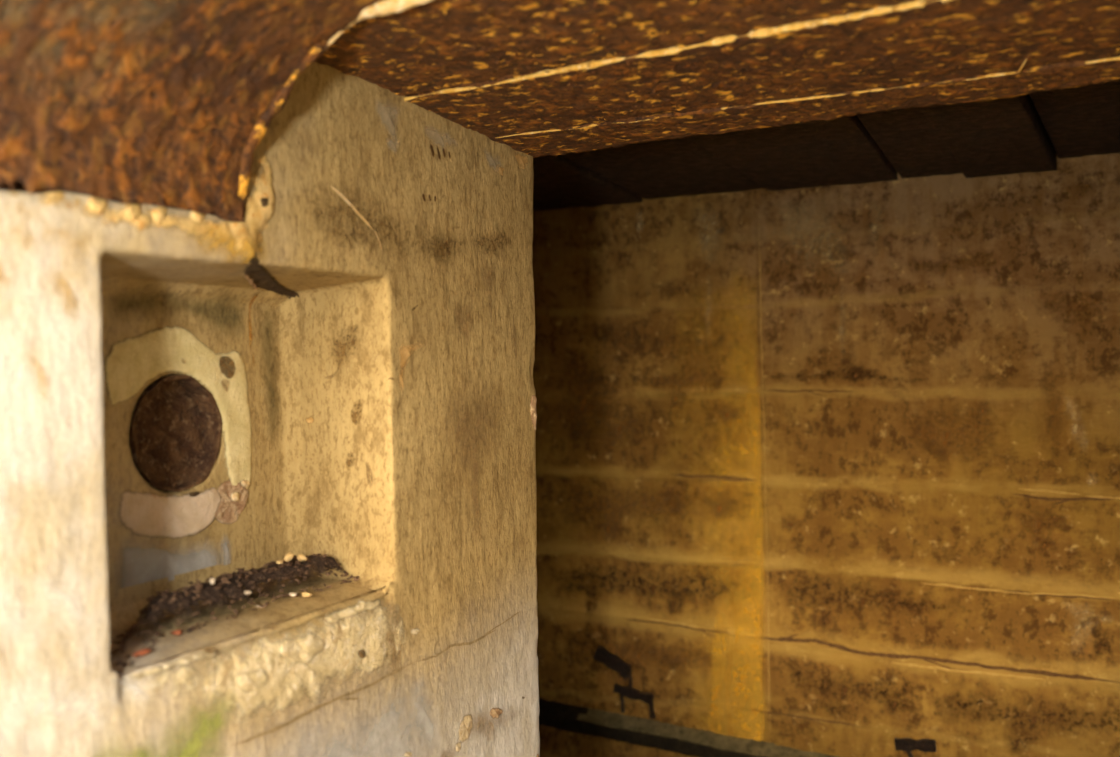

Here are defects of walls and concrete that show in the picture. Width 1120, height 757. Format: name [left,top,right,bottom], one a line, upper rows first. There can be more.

crack [1011,489,1120,504]
leakage [788,577,946,626]
crack [923,583,1120,600]
crack [230,611,521,746]
leakage [566,542,763,741]
leakage [791,671,908,714]
crack [622,618,1120,683]
leakage [935,693,1120,752]